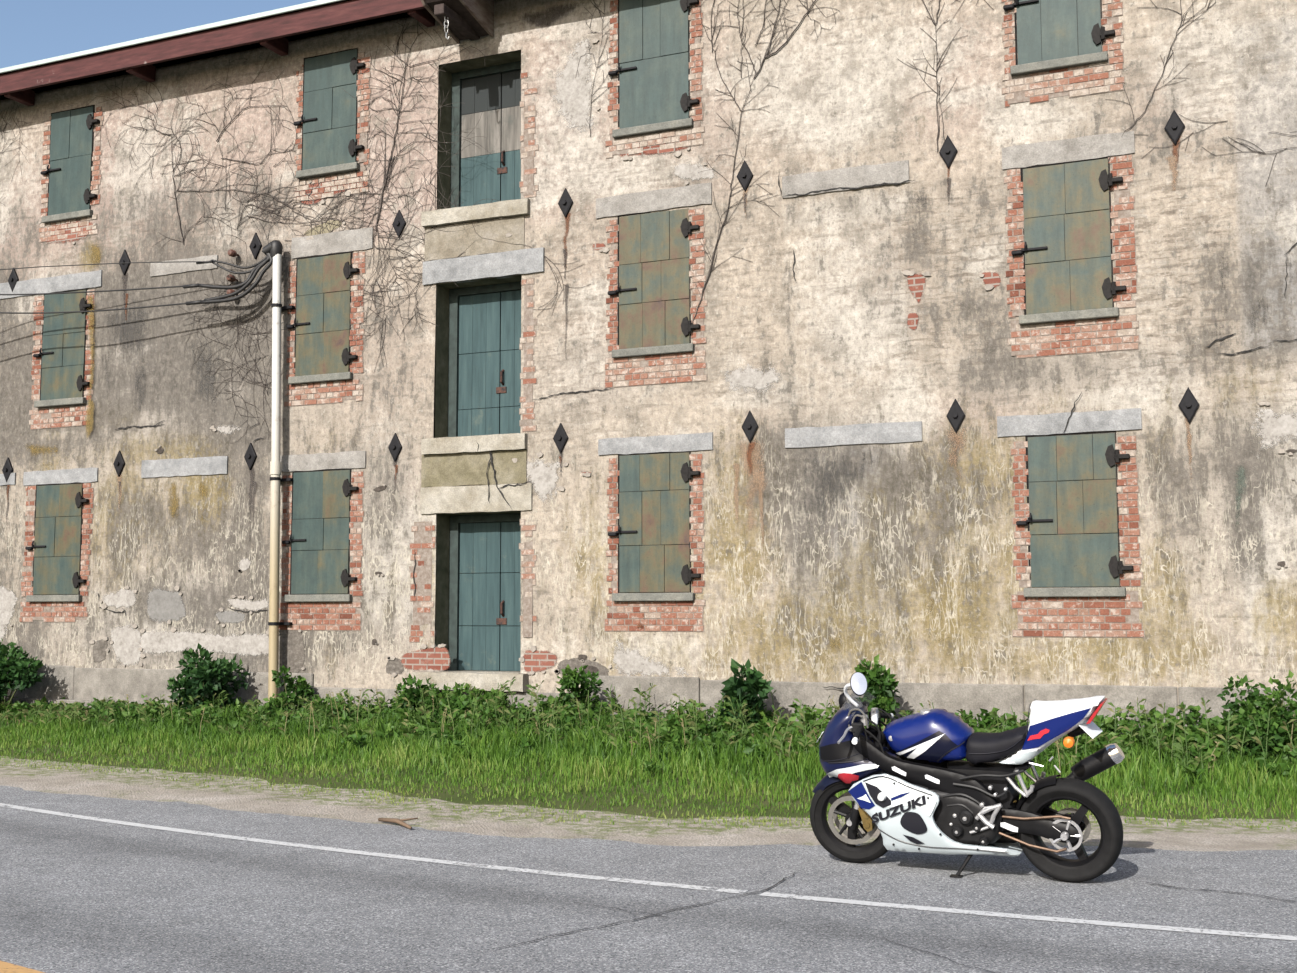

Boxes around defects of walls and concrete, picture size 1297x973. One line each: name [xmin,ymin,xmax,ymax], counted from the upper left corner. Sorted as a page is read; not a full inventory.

spalling [903,270,931,329]
crack [476,441,533,507]
corrosion [734,442,764,544]
peeling [89,586,306,673]
spalling [372,639,450,677]